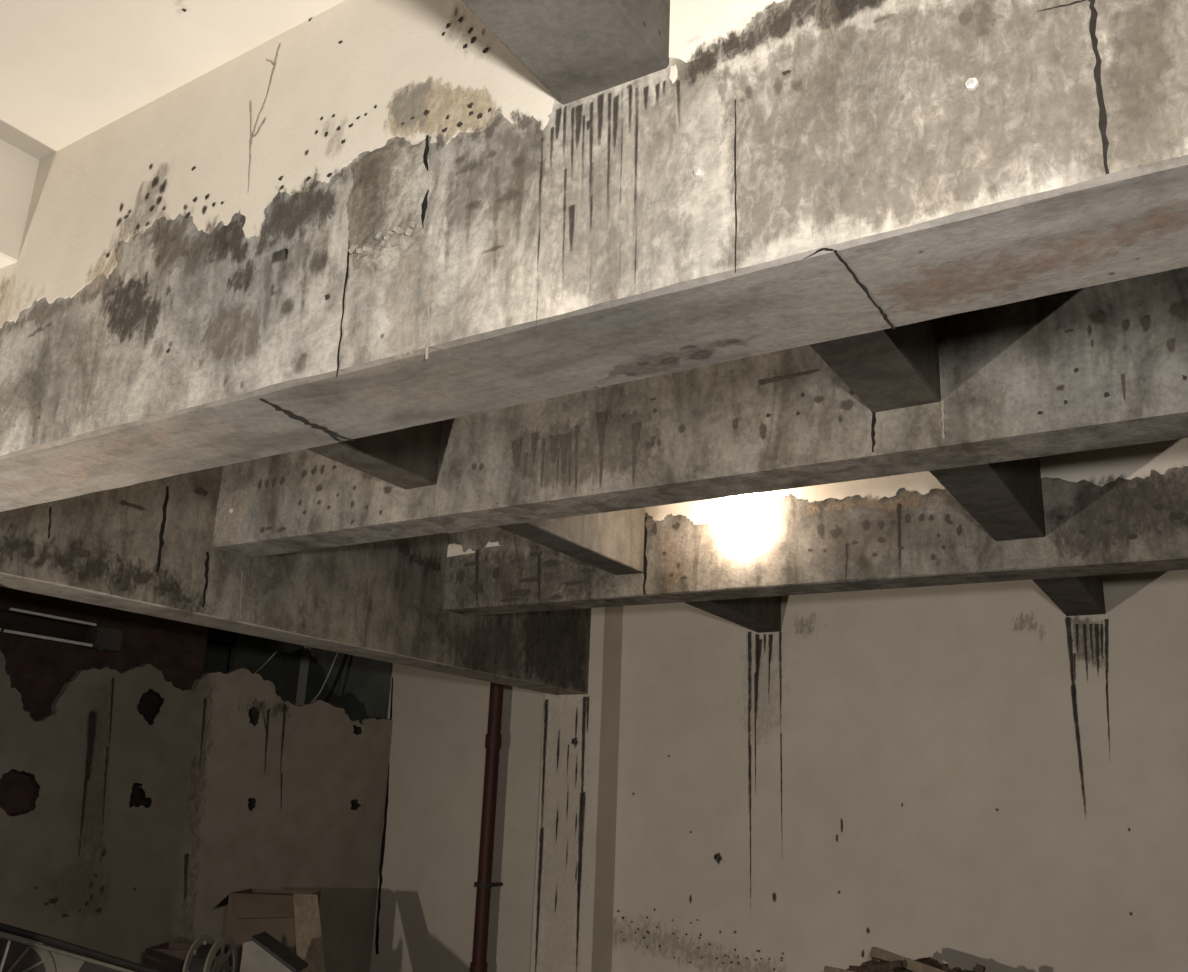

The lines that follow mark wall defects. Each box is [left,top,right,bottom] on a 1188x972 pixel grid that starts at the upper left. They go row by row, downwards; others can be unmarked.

spalling [4,109,540,342]
crack [336,241,350,377]
water stain [539,80,680,256]
crack [803,248,896,330]
crack [1037,0,1109,174]
crack [259,399,354,442]
hole [0,769,41,816]
spalling [137,688,164,725]
spalling [248,707,260,727]
water stain [521,600,606,972]
water stain [748,632,782,897]
water stain [1065,617,1110,811]